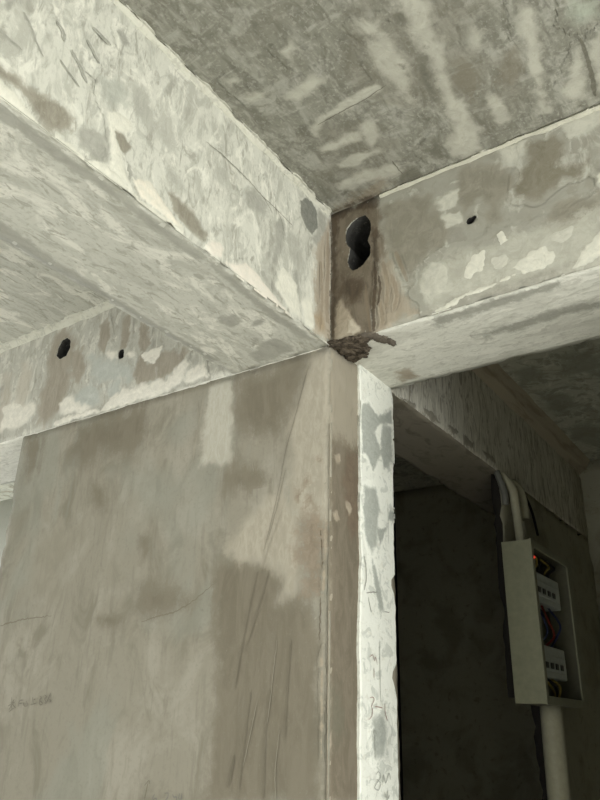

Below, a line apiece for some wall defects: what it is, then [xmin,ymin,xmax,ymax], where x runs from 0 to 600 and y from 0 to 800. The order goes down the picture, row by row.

crack [207,142,292,231]
peeling [382,130,600,312]
peeling [101,343,164,366]
spalling [327,296,396,363]
leakage [0,96,359,800]